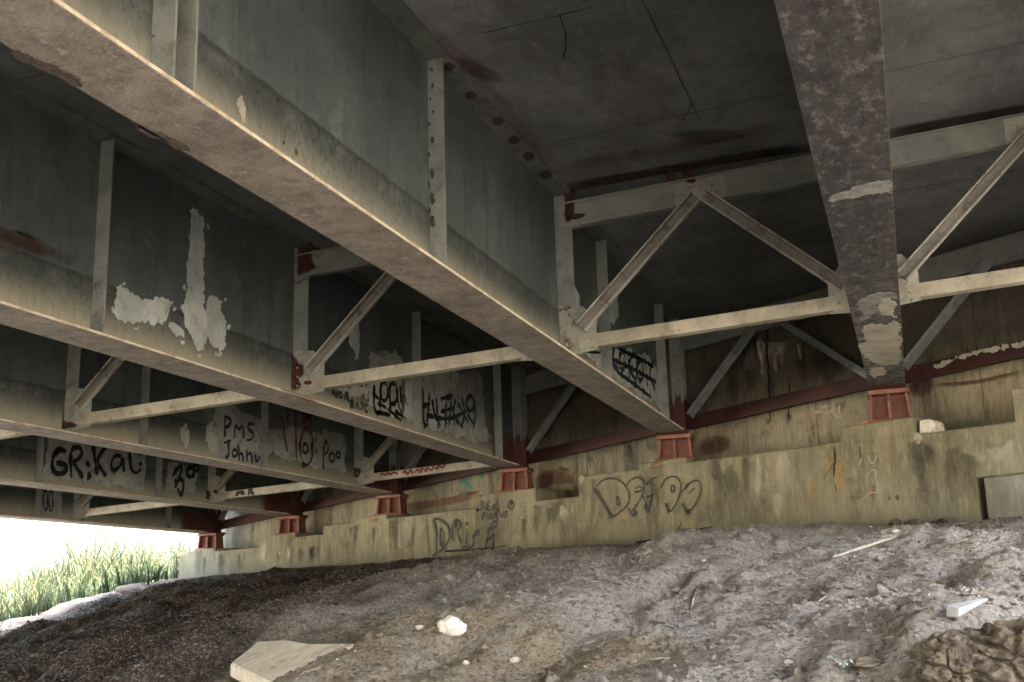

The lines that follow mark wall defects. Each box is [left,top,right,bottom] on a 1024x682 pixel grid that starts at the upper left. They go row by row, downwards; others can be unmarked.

crack [483,5,596,59]
crack [643,0,701,128]
corrosion [564,148,792,222]
peeling [828,180,895,203]
peeling [111,208,231,358]
corrosion [297,242,316,275]
peeling [856,292,903,378]
peeling [933,340,1024,369]